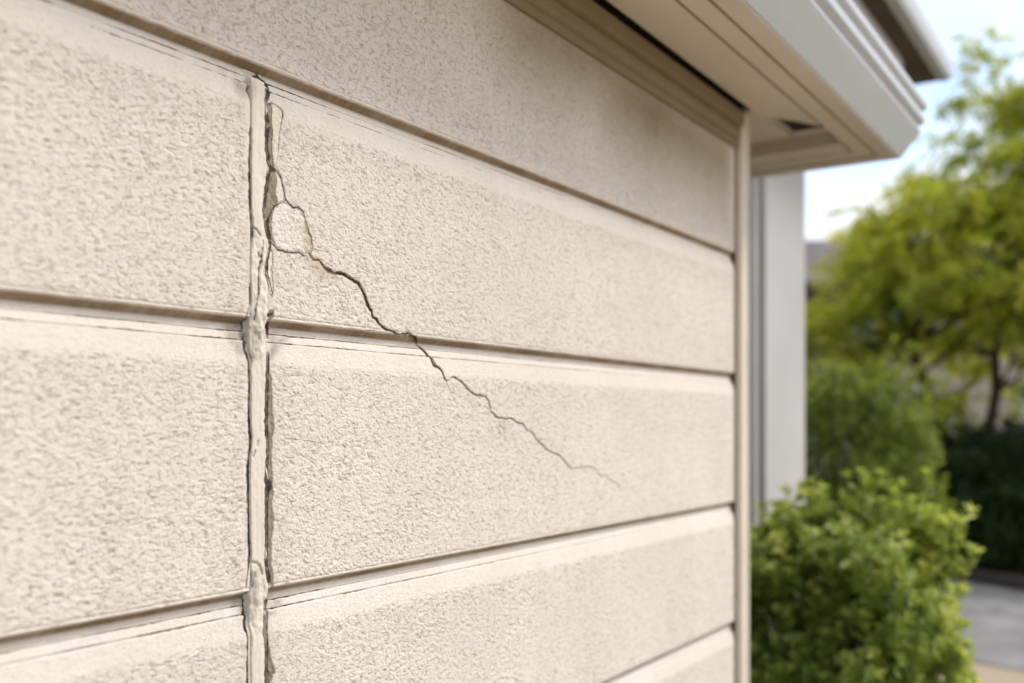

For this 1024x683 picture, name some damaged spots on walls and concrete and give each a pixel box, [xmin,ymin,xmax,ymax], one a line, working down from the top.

crack [0,312,161,332]
crack [188,173,639,491]